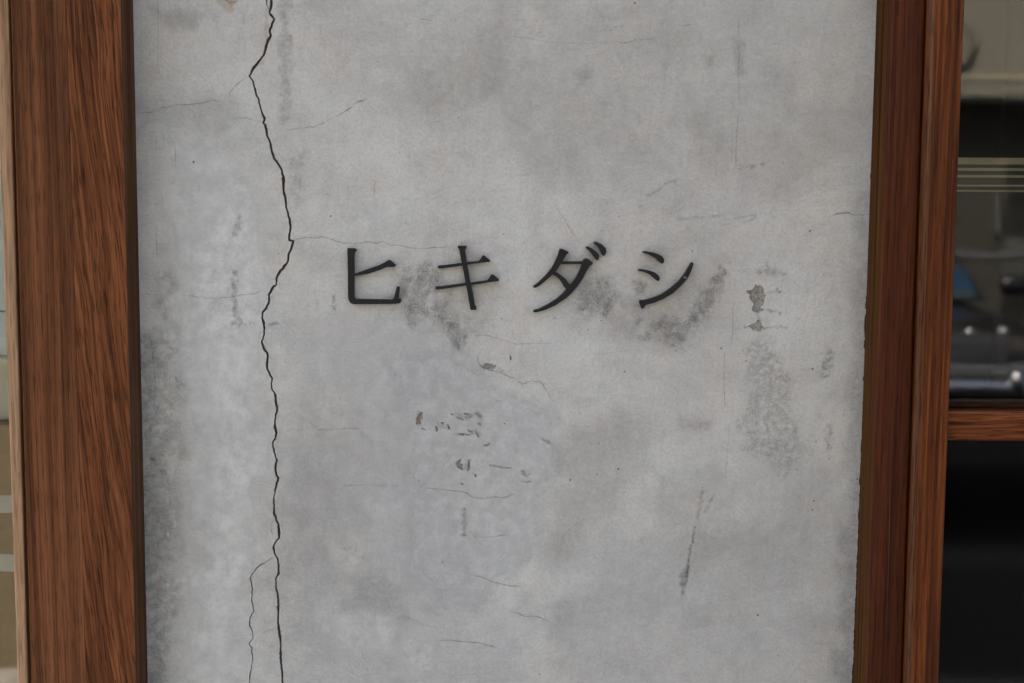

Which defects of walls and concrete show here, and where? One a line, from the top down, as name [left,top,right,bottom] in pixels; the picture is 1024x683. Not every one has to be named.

spalling [746,284,766,332]
crack [249,0,337,683]
spalling [416,412,490,447]